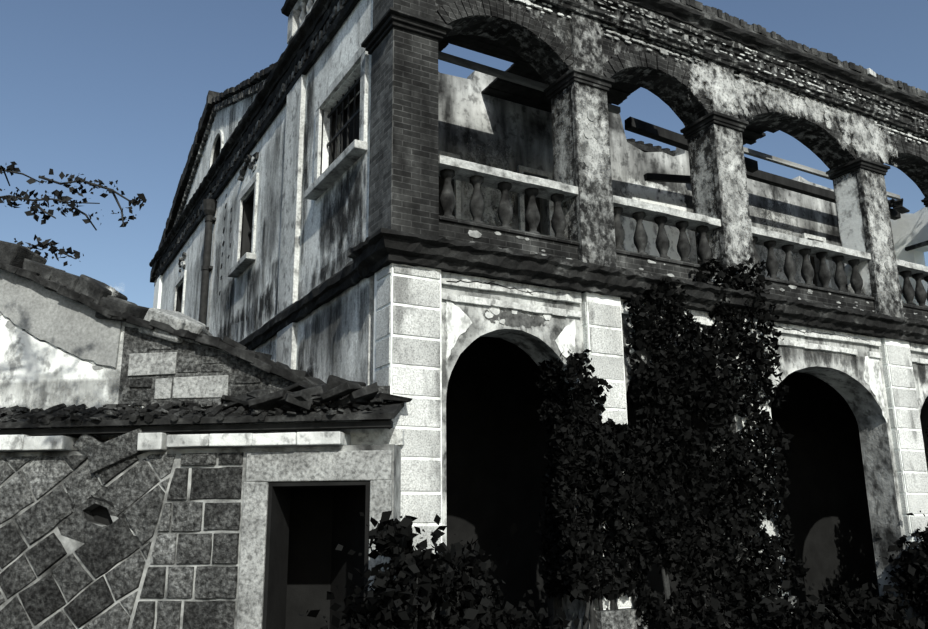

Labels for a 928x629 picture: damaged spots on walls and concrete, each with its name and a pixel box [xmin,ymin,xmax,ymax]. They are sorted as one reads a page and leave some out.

peeling [514,0,571,18]
peeling [598,0,928,145]
peeling [0,311,115,408]
water stain [214,209,278,341]
flaking render [126,341,413,411]
water stain [298,303,347,377]
water stain [311,168,366,289]
spalling [484,307,551,328]